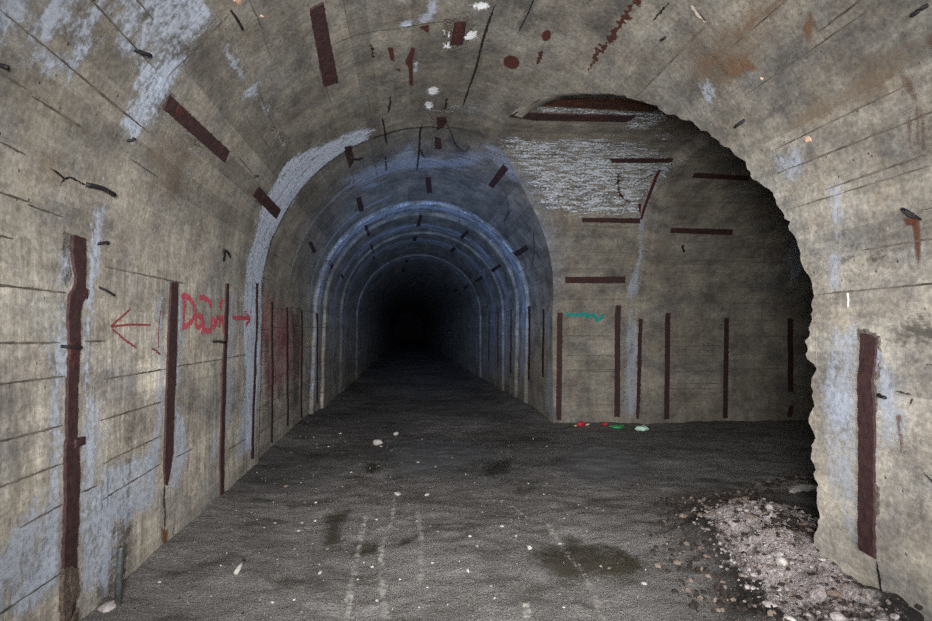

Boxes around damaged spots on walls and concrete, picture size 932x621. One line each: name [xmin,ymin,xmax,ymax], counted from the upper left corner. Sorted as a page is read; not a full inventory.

damp [0,0,26,35]
damp [29,0,104,79]
damp [114,0,210,143]
damp [537,107,667,138]
damp [486,137,674,230]